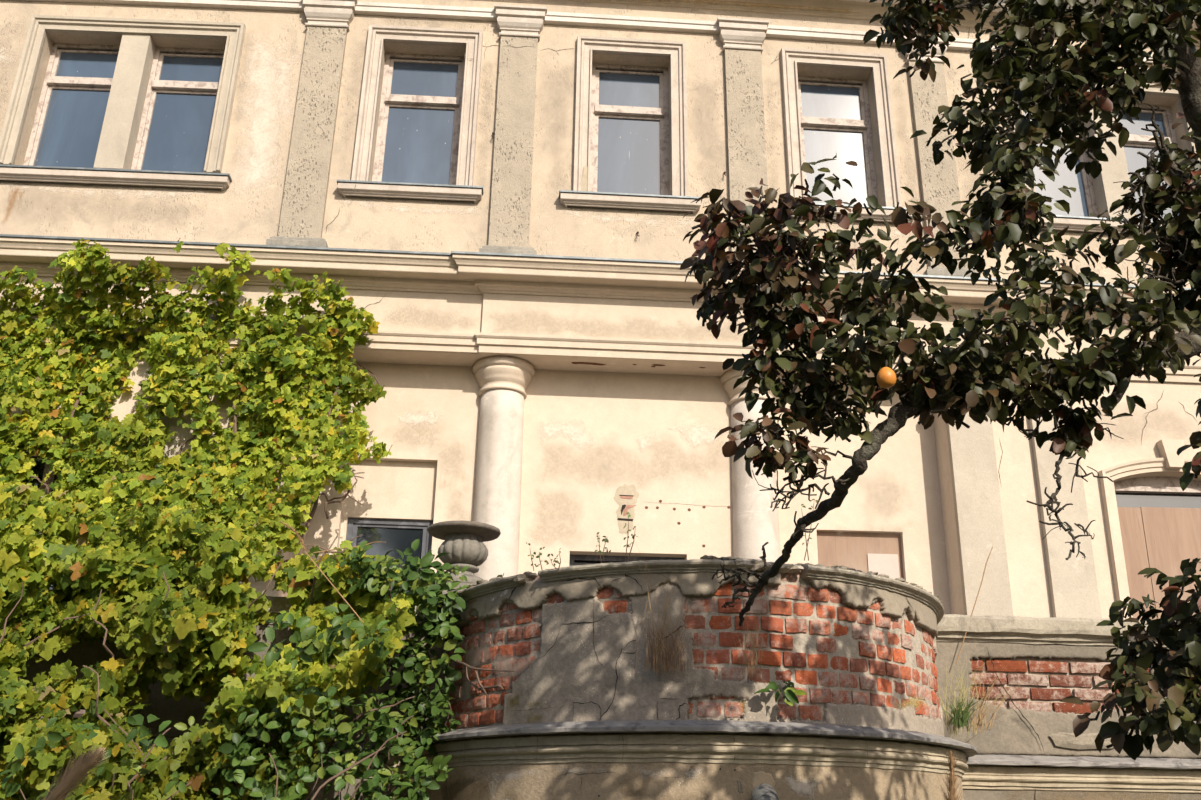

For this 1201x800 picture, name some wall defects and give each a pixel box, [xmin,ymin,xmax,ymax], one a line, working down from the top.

flaking render [444,593,566,731]
crack [507,573,682,789]
flaking render [596,587,633,614]
flaking render [969,660,1125,714]